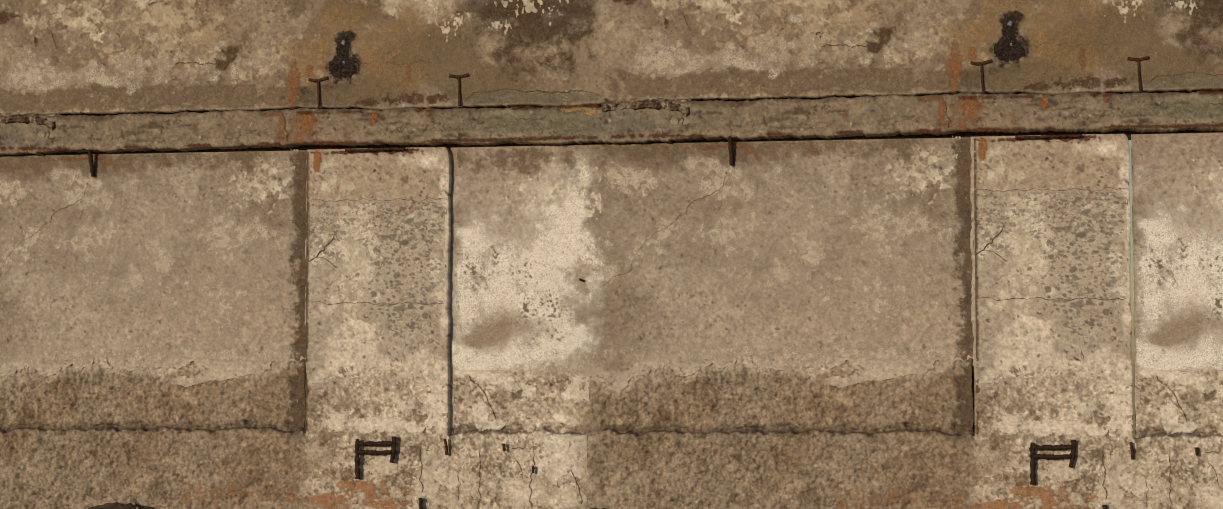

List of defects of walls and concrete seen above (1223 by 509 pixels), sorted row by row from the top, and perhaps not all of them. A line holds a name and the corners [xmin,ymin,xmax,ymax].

peeling [24,0,324,87]
damp [0,0,597,111]
peeling [364,0,470,42]
peeling [486,0,569,35]
peeling [654,0,989,71]
damp [610,0,1223,97]
peeling [1102,0,1143,23]
peeling [1170,0,1198,15]
rust [258,64,757,172]
rust [916,49,1223,160]
flaking render [0,134,1223,509]
rust [285,471,412,509]